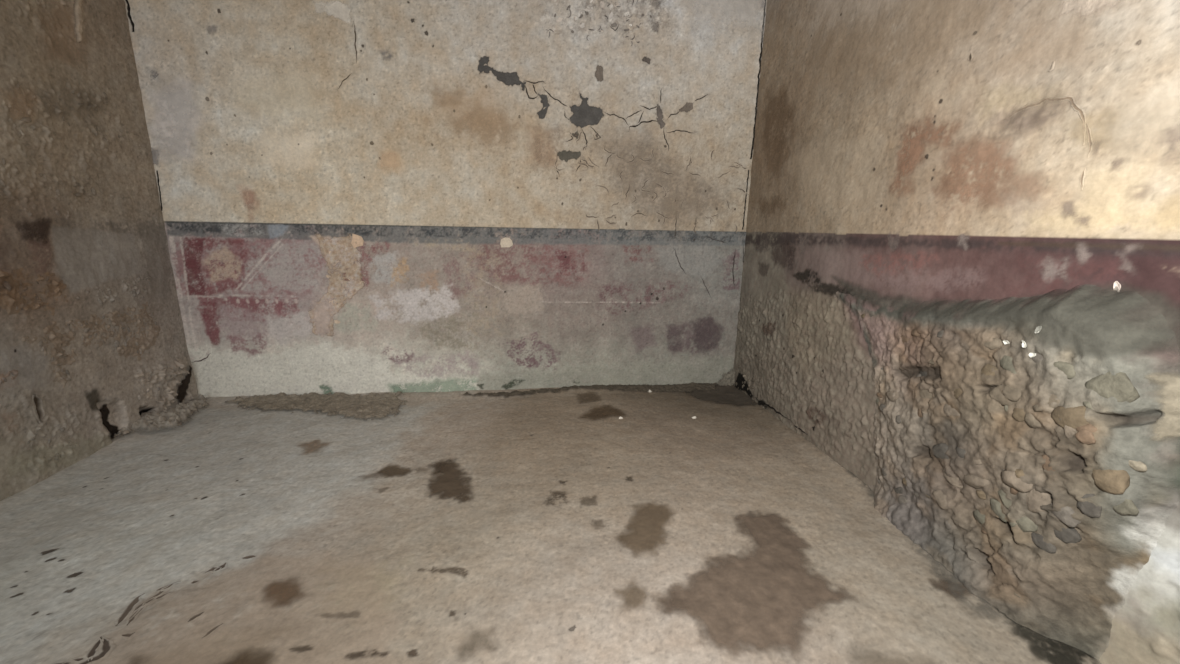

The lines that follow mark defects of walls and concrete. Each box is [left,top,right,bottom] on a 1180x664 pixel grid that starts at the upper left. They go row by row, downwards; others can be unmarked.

flaking render [475,53,552,120]
flaking render [555,63,607,164]
crack [524,0,767,310]
flaking render [655,102,665,132]
peeling [309,234,365,336]
leakage [429,460,470,501]
leakage [619,504,671,552]
flaking render [813,280,1180,662]
leakage [661,513,850,653]